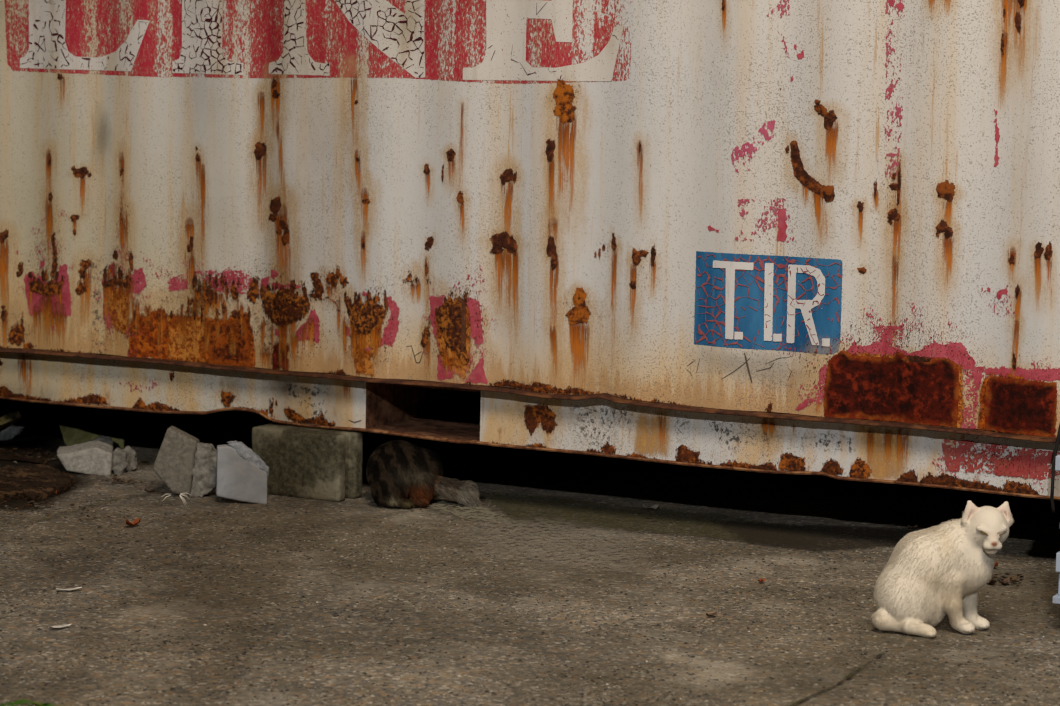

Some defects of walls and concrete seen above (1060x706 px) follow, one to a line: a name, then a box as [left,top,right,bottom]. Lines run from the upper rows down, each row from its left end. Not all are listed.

crack [22,0,147,70]
crack [172,0,242,74]
crack [335,0,424,77]
rust [545,74,579,209]
peeling [731,120,775,173]
rust [128,77,408,395]
peeling [735,198,794,243]
rust [936,180,958,278]
rust [546,222,597,371]
crack [695,253,842,353]
rust [489,329,806,471]
peeling [772,302,1060,493]